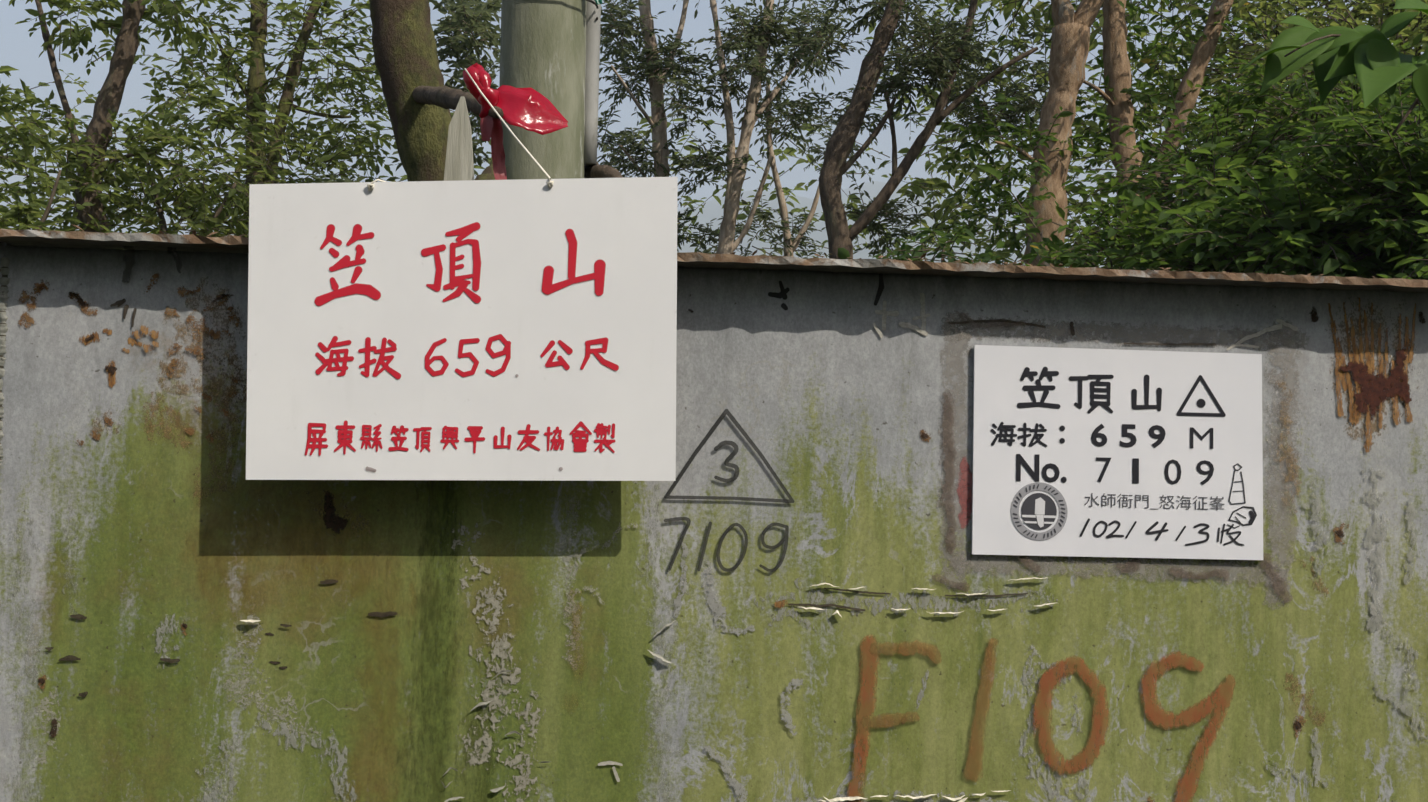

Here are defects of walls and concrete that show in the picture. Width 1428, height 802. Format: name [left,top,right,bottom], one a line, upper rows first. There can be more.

corrosion [18,280,50,328]
corrosion [68,277,247,507]
corrosion [1309,297,1426,453]
peeling [751,577,1058,629]
water stain [648,620,675,663]
water stain [1020,645,1089,802]
spalling [704,745,748,802]
peeling [795,790,1011,802]